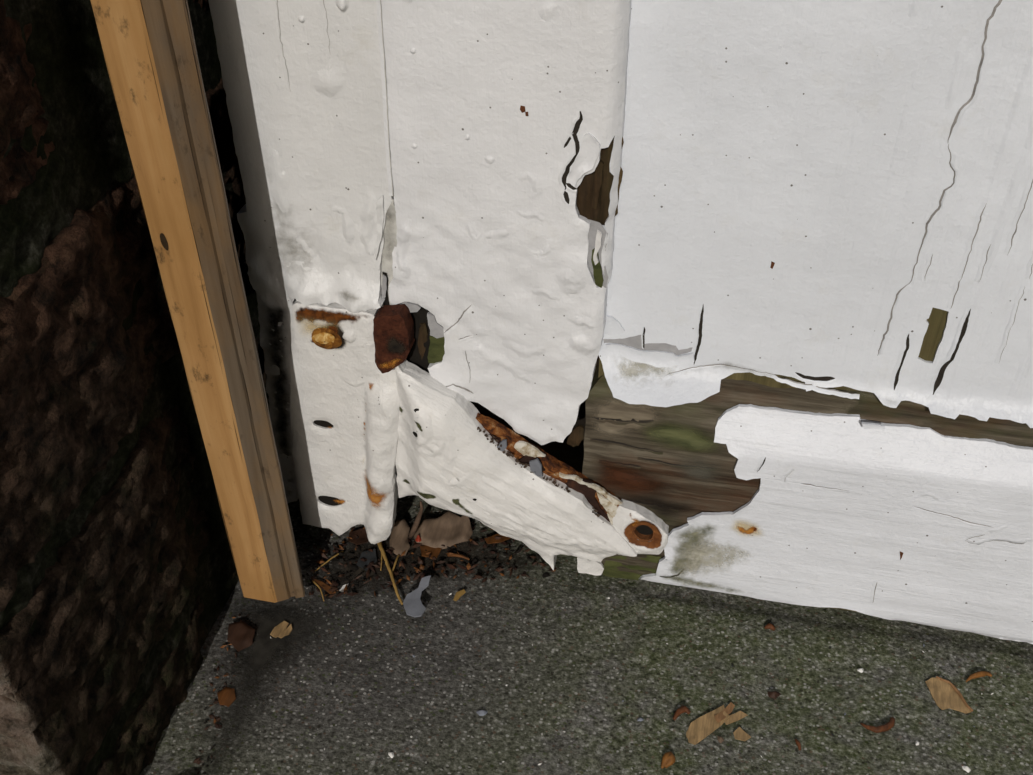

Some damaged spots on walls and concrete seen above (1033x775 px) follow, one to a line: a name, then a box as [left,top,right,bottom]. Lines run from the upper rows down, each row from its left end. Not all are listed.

peeling [569,132,600,187]
crack [877,0,1007,390]
peeling [588,219,608,288]
crack [930,168,1033,395]
rust [296,308,360,348]
crack [663,304,860,399]
peeling [918,308,948,361]
rust [518,455,545,471]
peeling [590,400,716,514]
rust [566,478,610,522]
rust [624,515,662,549]
water stain [666,544,743,587]